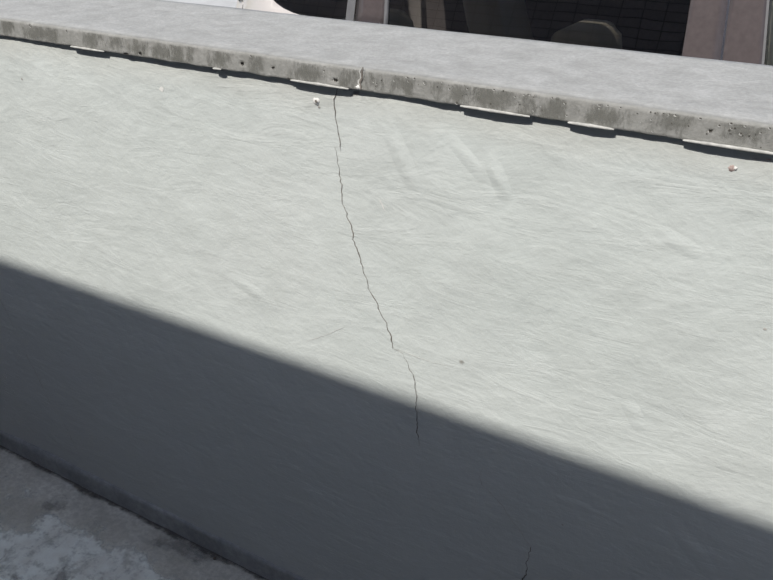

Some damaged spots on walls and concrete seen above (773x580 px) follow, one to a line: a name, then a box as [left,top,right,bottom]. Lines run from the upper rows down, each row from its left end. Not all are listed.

crack [333,67,419,440]